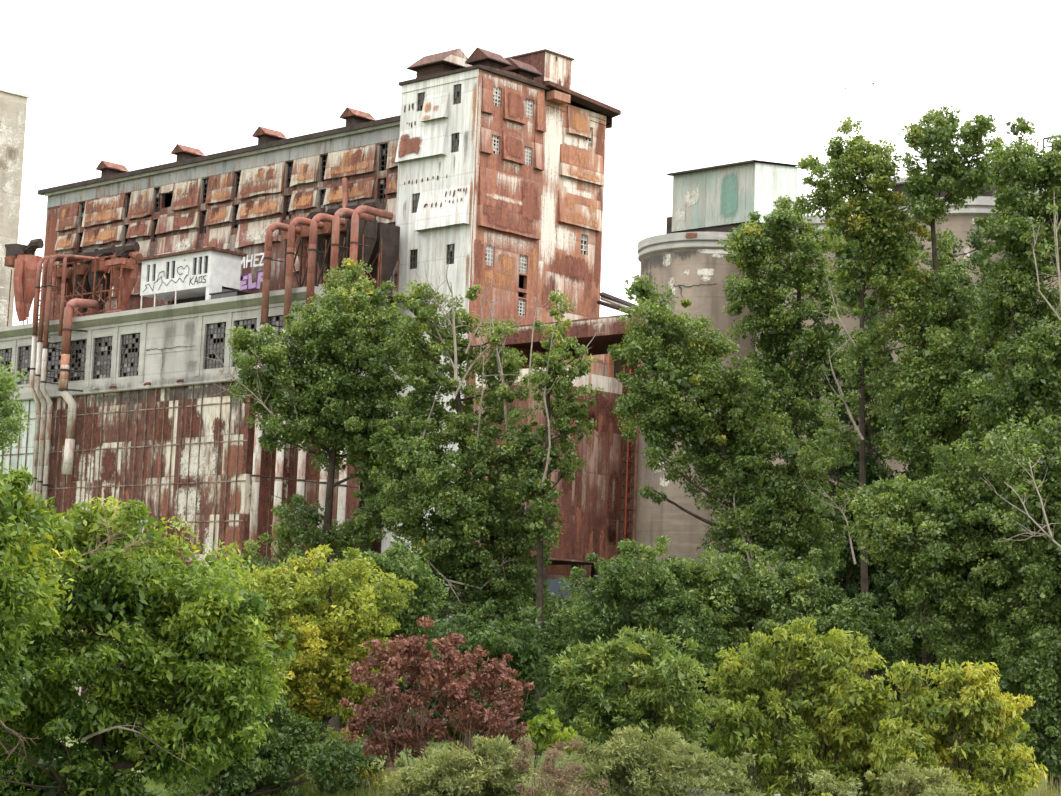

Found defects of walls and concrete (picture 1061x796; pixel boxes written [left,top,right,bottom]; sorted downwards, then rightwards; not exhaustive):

corrosion [208,168,277,222]
corrosion [328,149,368,201]
corrosion [388,102,447,191]
corrosion [424,182,539,233]
corrosion [531,112,604,312]
corrosion [465,240,516,292]
corrosion [66,417,77,521]
corrosion [90,417,132,512]
corrosion [144,408,192,569]
corrosion [186,411,225,439]
corrosion [223,440,289,563]
corrosion [548,387,618,562]